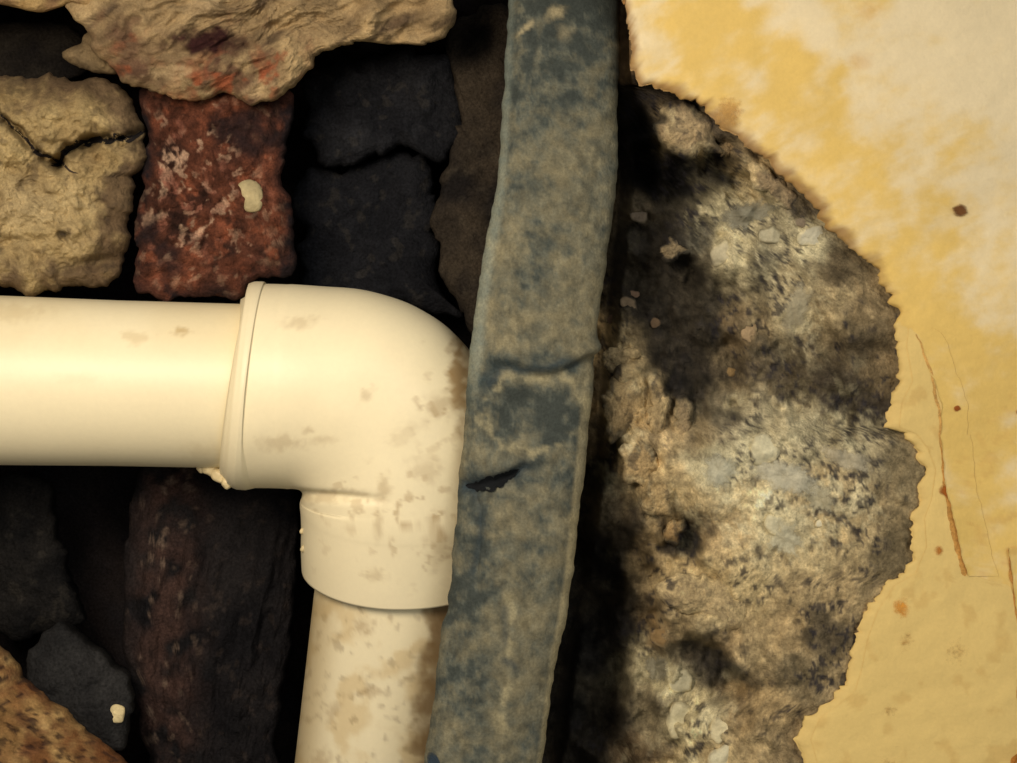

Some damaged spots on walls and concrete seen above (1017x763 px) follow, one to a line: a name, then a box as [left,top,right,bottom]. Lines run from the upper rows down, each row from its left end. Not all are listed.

crack [0,114,146,173]
spalling [238,179,263,213]
flaking render [542,0,1017,763]
crack [916,335,967,576]
crack [1008,549,1017,618]